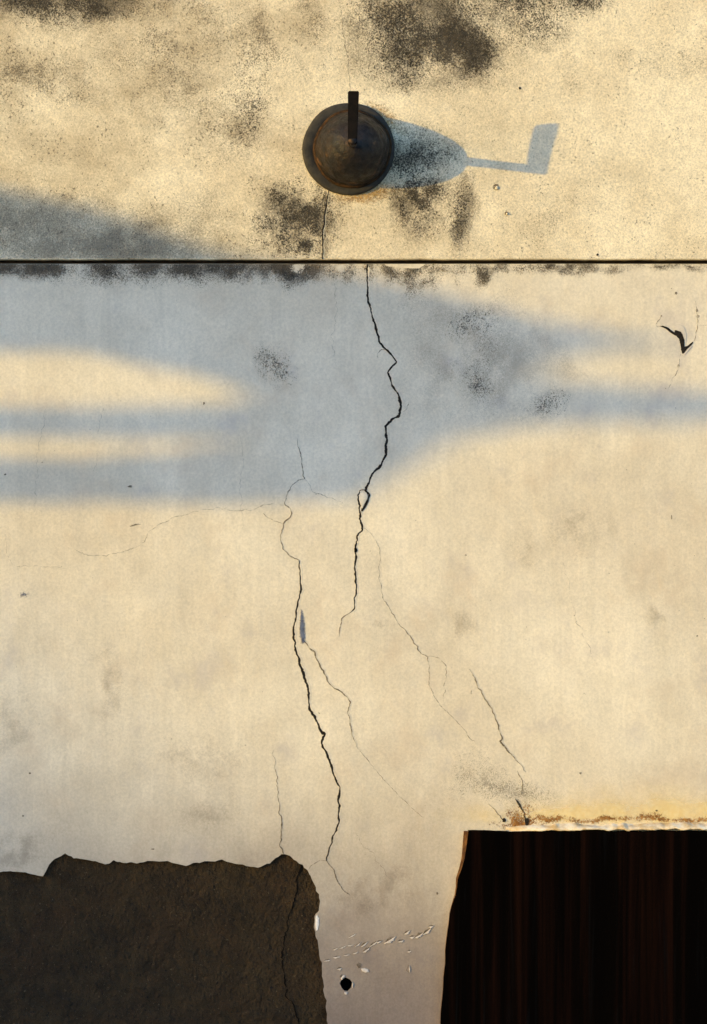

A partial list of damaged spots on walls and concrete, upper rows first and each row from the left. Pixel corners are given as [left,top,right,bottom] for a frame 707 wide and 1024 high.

leakage [347,0,603,92]
leakage [243,178,353,258]
crack [322,190,330,259]
leakage [380,128,472,250]
crack [339,264,529,826]
crack [263,439,424,1023]
rust [489,803,707,829]
spalling [0,854,434,1024]